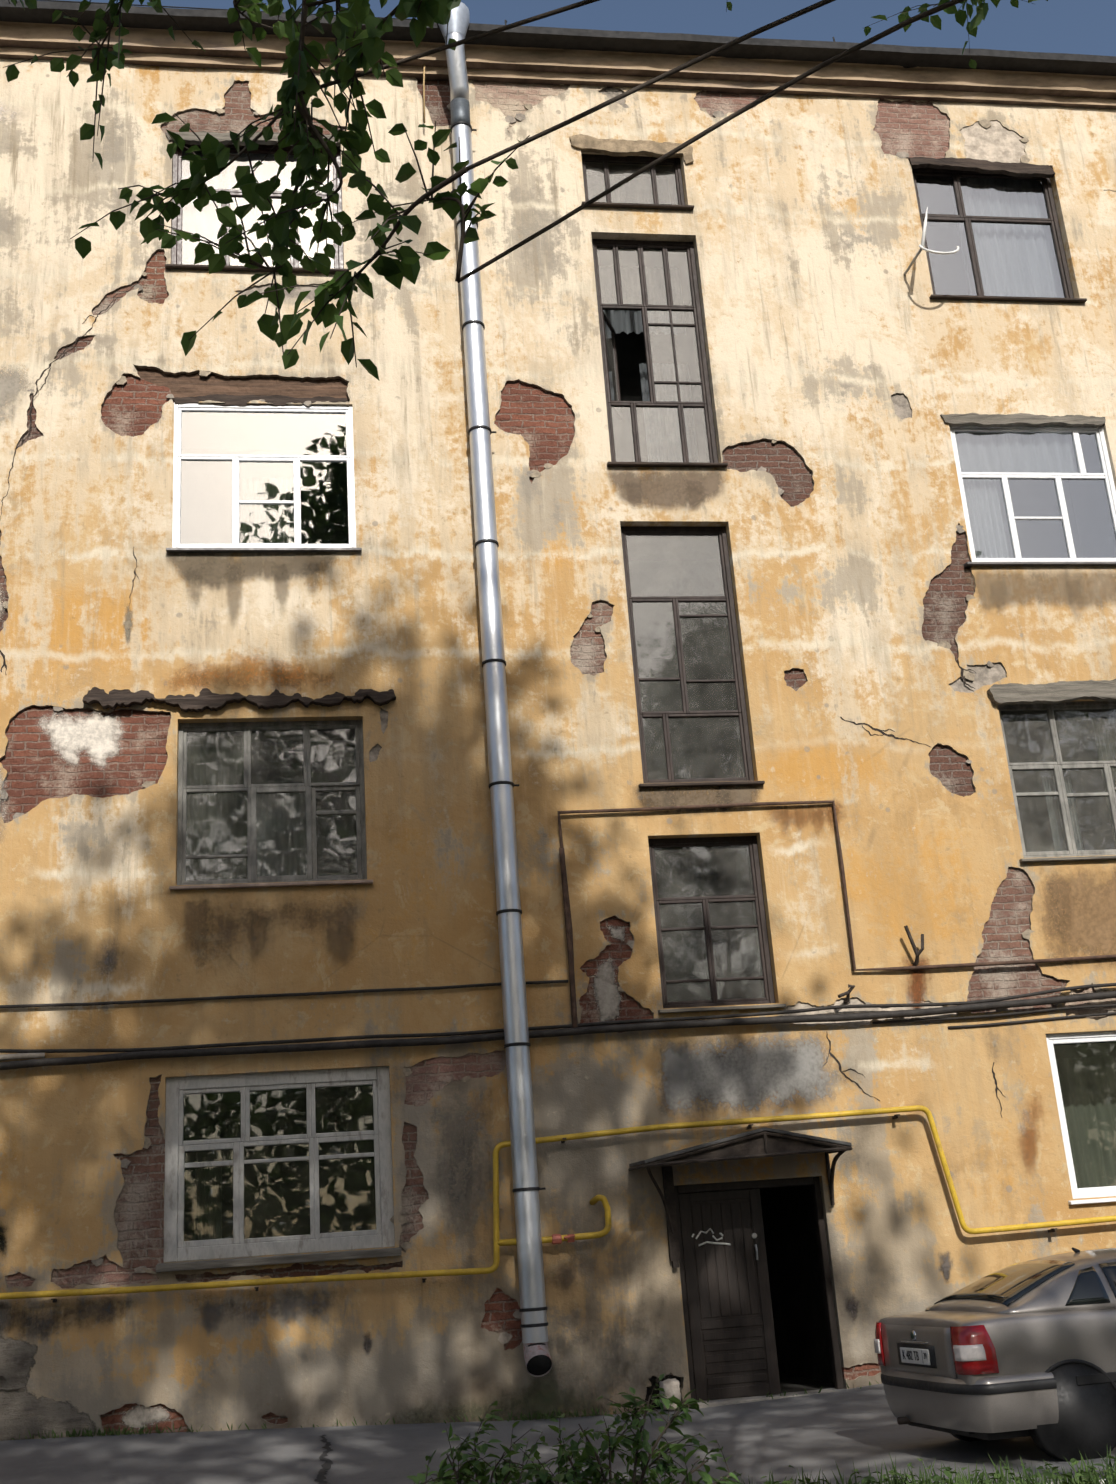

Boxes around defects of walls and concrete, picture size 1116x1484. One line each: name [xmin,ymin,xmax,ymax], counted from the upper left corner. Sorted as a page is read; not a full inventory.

spalling [161,82,283,136]
crack [0,282,140,520]
flaking render [101,375,174,437]
flaking render [494,381,575,484]
flaking render [722,440,813,507]
flaking render [922,525,1006,693]
crack [0,650,8,674]
flaking render [0,706,171,823]
flaking render [928,744,975,797]
peeling [662,867,1116,1114]
crack [823,1031,880,1101]
flaking render [5,1051,506,1289]